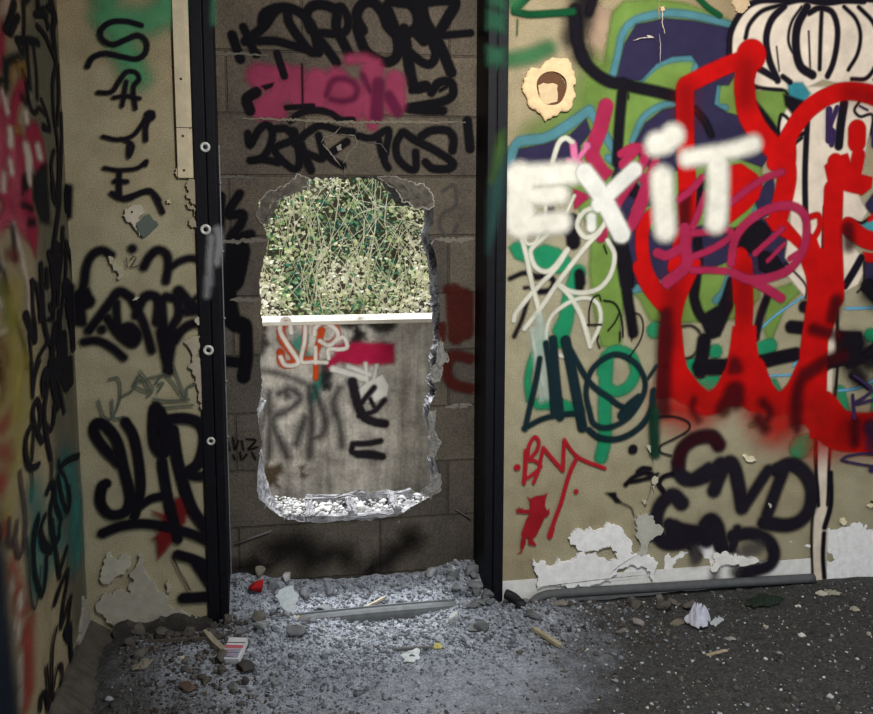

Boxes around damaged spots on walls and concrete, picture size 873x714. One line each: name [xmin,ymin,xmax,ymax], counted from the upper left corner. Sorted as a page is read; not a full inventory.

flaking render [521,57,576,122]
spalling [256,173,449,524]
peeling [532,513,688,589]
peeling [698,545,759,572]
peeling [825,518,873,595]
peeling [76,552,197,645]